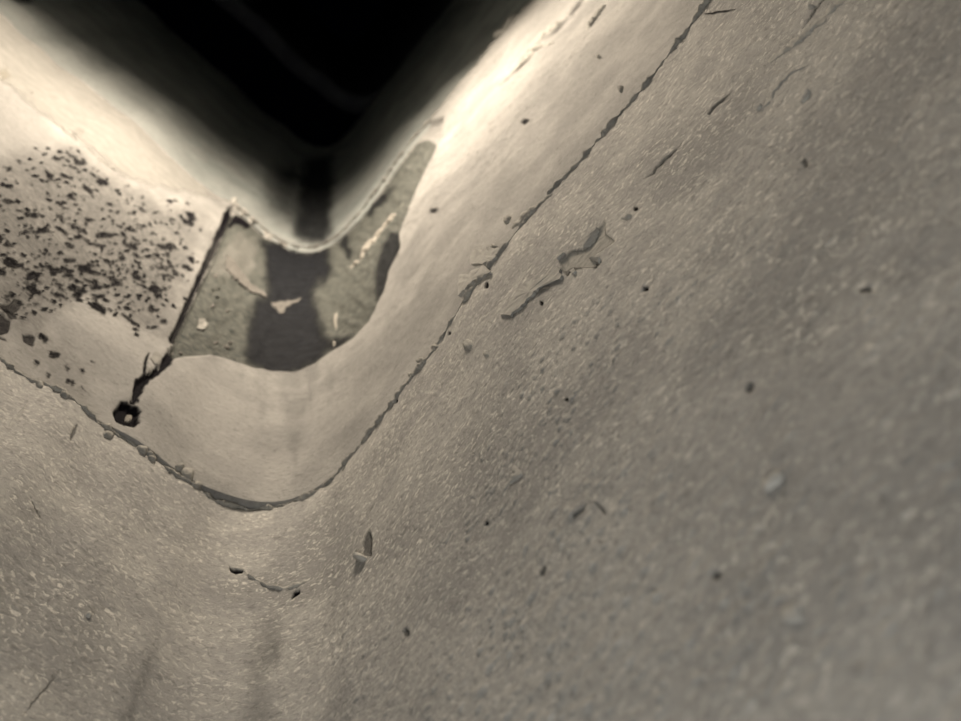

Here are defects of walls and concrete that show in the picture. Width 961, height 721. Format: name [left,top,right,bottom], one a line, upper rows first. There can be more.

spalling [0,141,436,372]